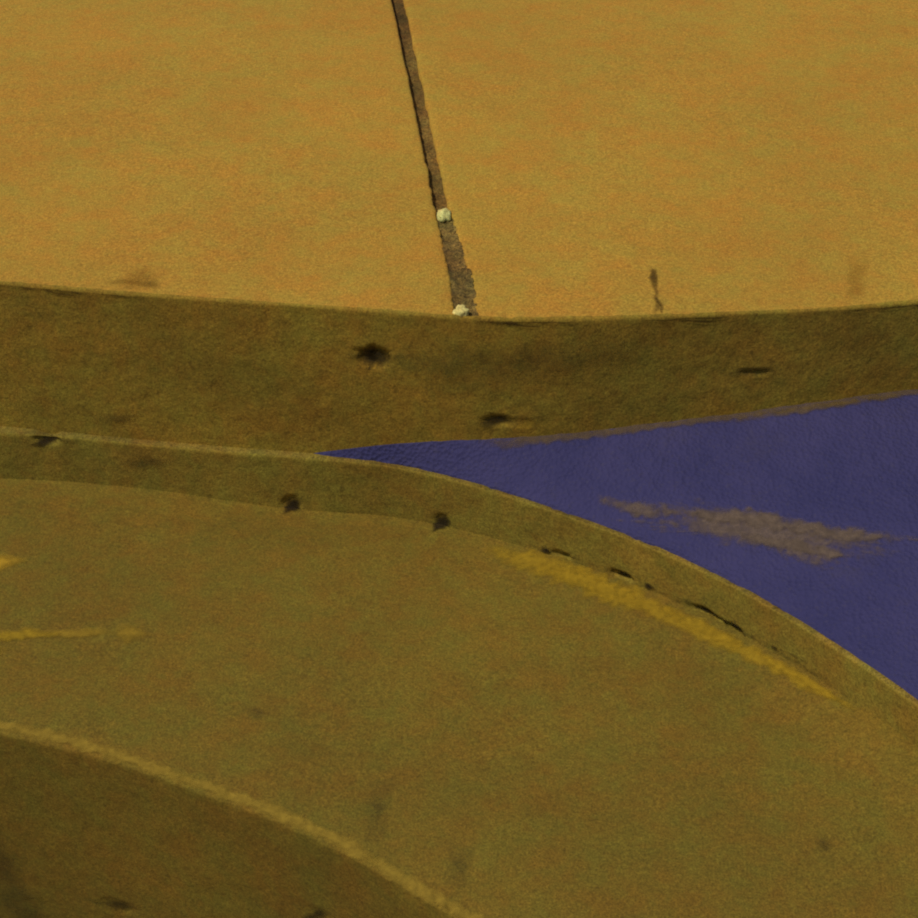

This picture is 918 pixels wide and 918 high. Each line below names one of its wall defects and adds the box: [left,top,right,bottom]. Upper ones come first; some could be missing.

spalling [361,349,386,363]